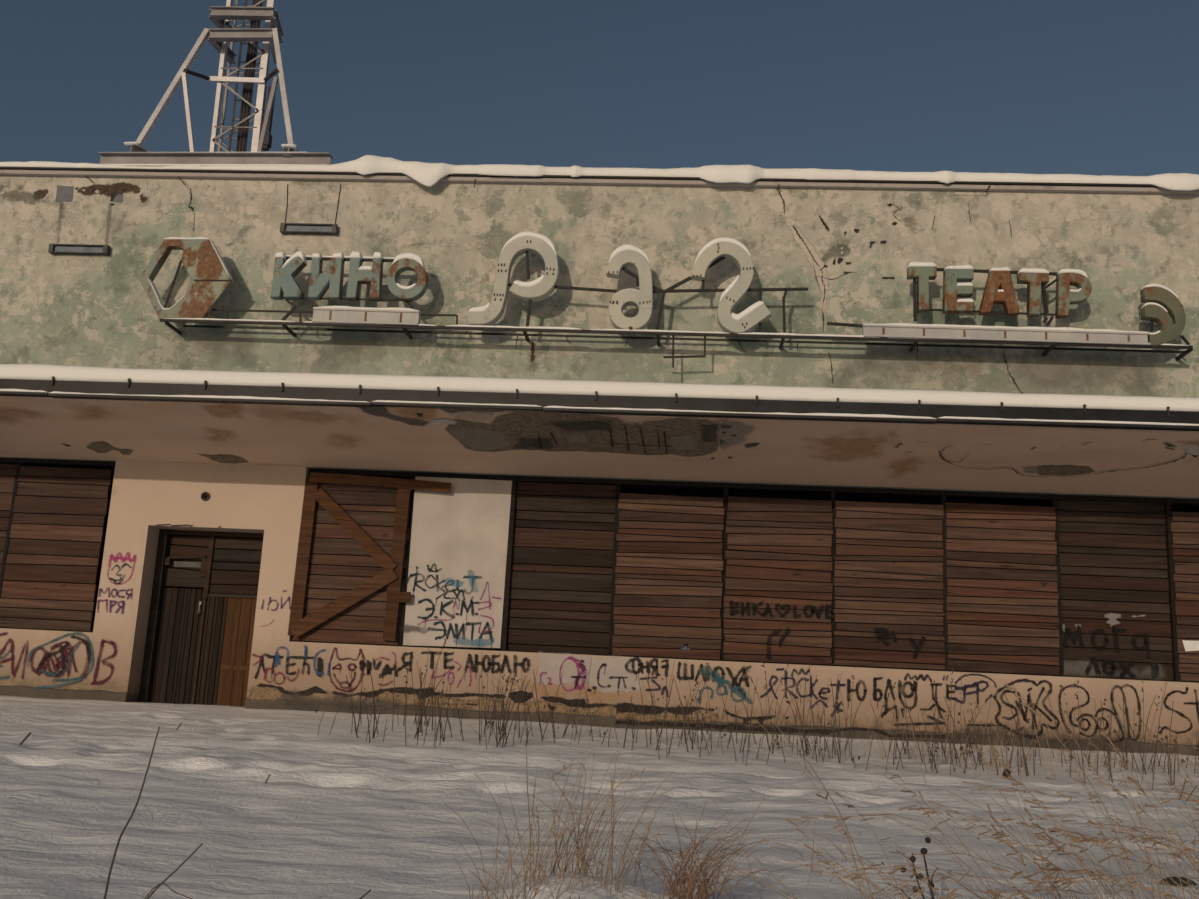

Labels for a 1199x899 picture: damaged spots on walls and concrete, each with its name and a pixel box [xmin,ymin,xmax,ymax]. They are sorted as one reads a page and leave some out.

peeling [33,189,48,200]
peeling [75,182,147,203]
crack [777,184,855,383]
spalling [359,406,760,460]
spalling [87,442,132,455]
spalling [198,454,248,464]